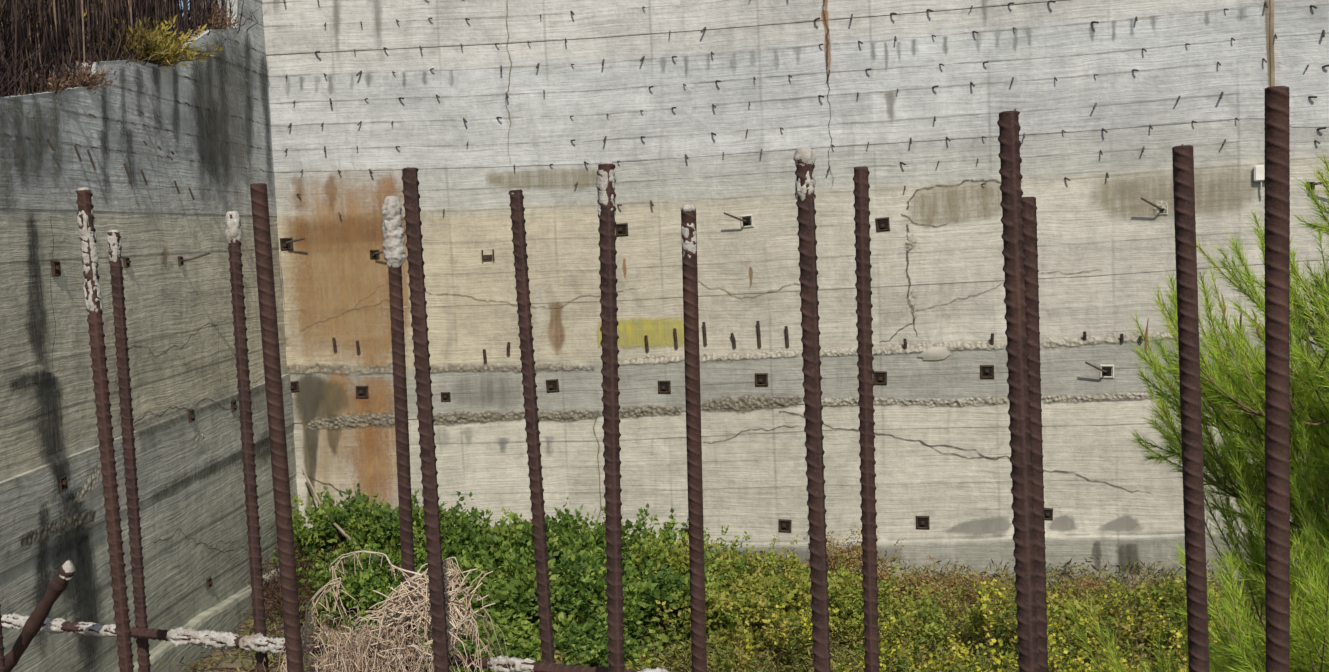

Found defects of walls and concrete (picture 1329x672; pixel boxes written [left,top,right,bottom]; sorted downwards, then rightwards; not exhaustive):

corrosion [822,0,830,68]
water stain [0,95,62,207]
water stain [102,36,272,191]
crack [881,179,1003,342]
water stain [12,214,103,668]
crack [703,411,1010,460]
crack [1043,469,1151,494]